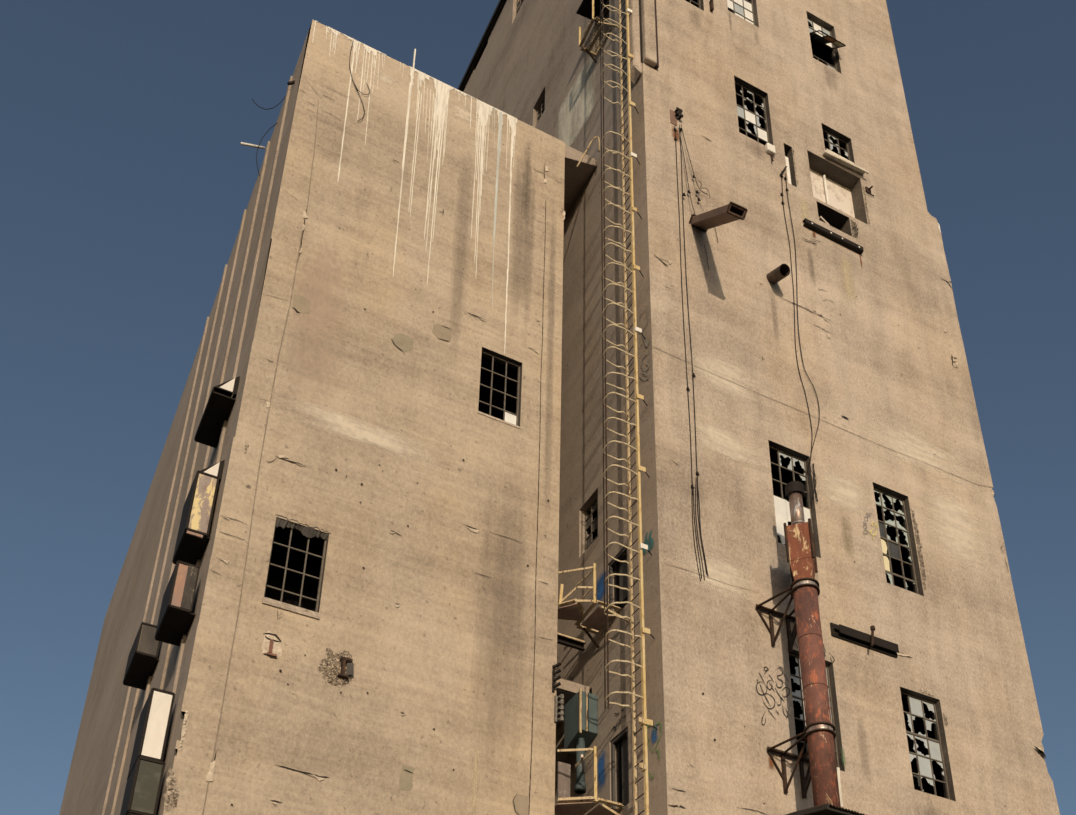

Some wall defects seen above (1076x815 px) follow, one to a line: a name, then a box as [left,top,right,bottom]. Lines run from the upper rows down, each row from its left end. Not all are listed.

leakage [312,20,392,181]
leakage [393,62,517,354]
spalling [262,631,282,658]
spalling [318,648,354,688]
spalling [163,767,179,812]